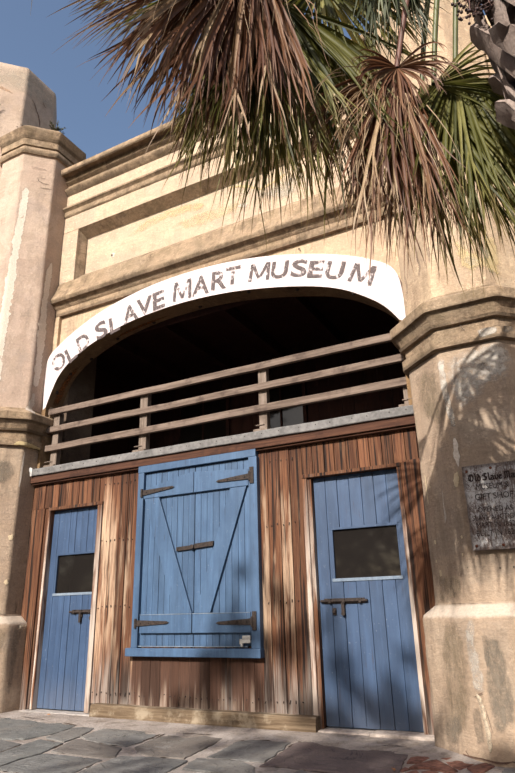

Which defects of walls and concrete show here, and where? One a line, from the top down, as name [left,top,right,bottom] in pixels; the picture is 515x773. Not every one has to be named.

peeling [0,187,30,380]
peeling [25,263,52,414]
peeling [438,361,454,424]
leakage [444,628,467,742]
leakage [485,640,513,731]